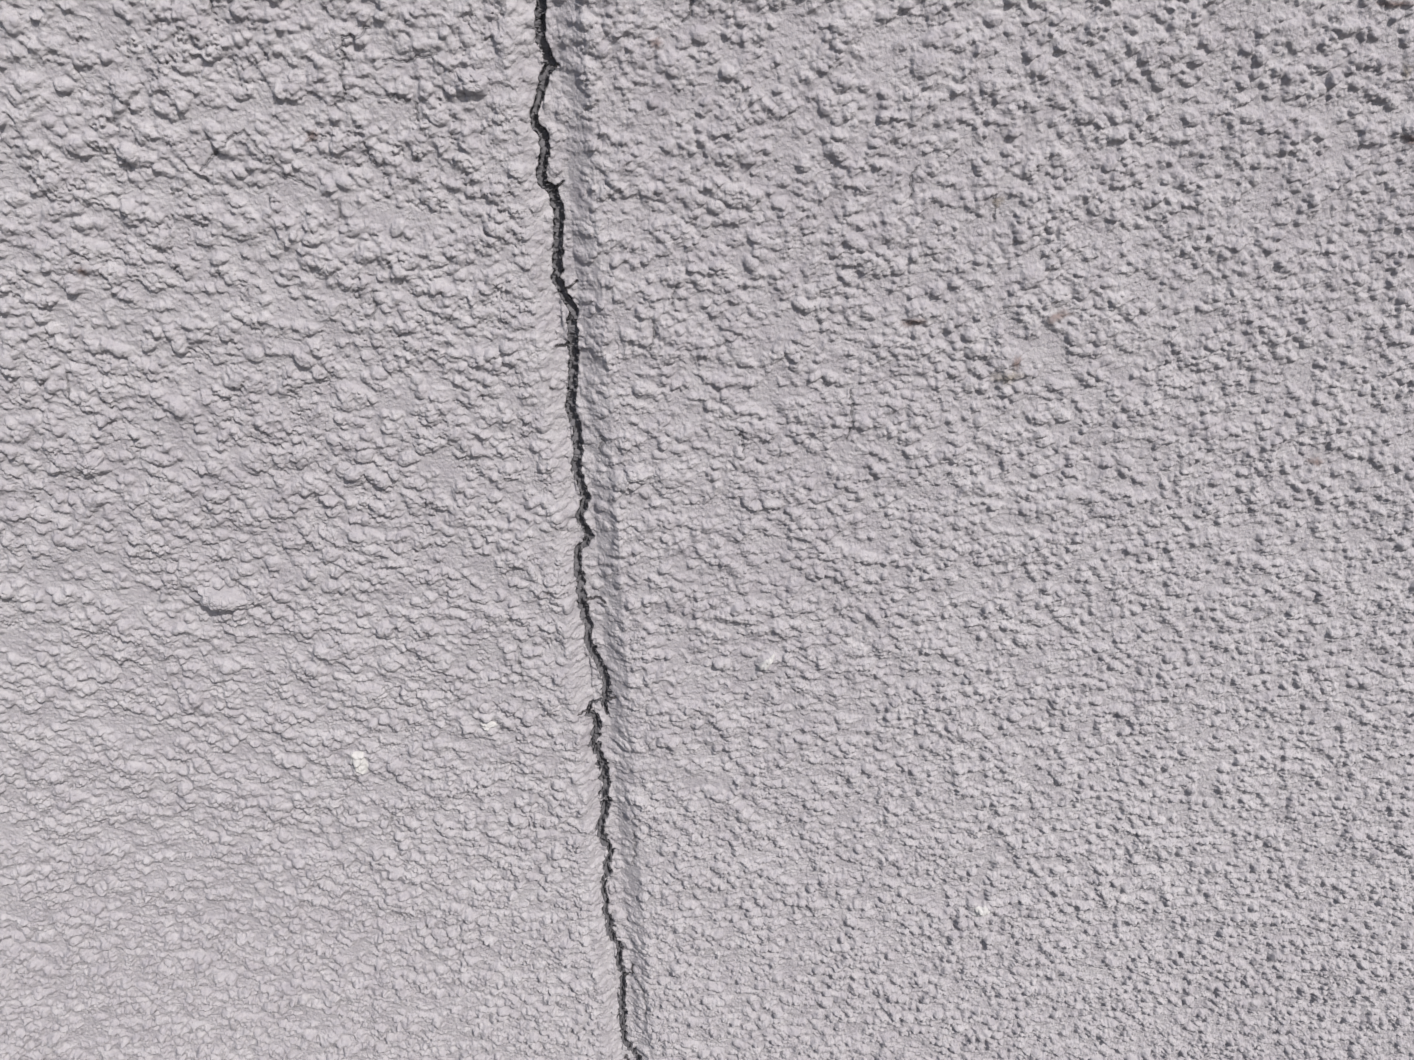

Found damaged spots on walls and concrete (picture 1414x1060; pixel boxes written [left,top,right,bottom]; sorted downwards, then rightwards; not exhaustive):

crack [530,0,647,1060]